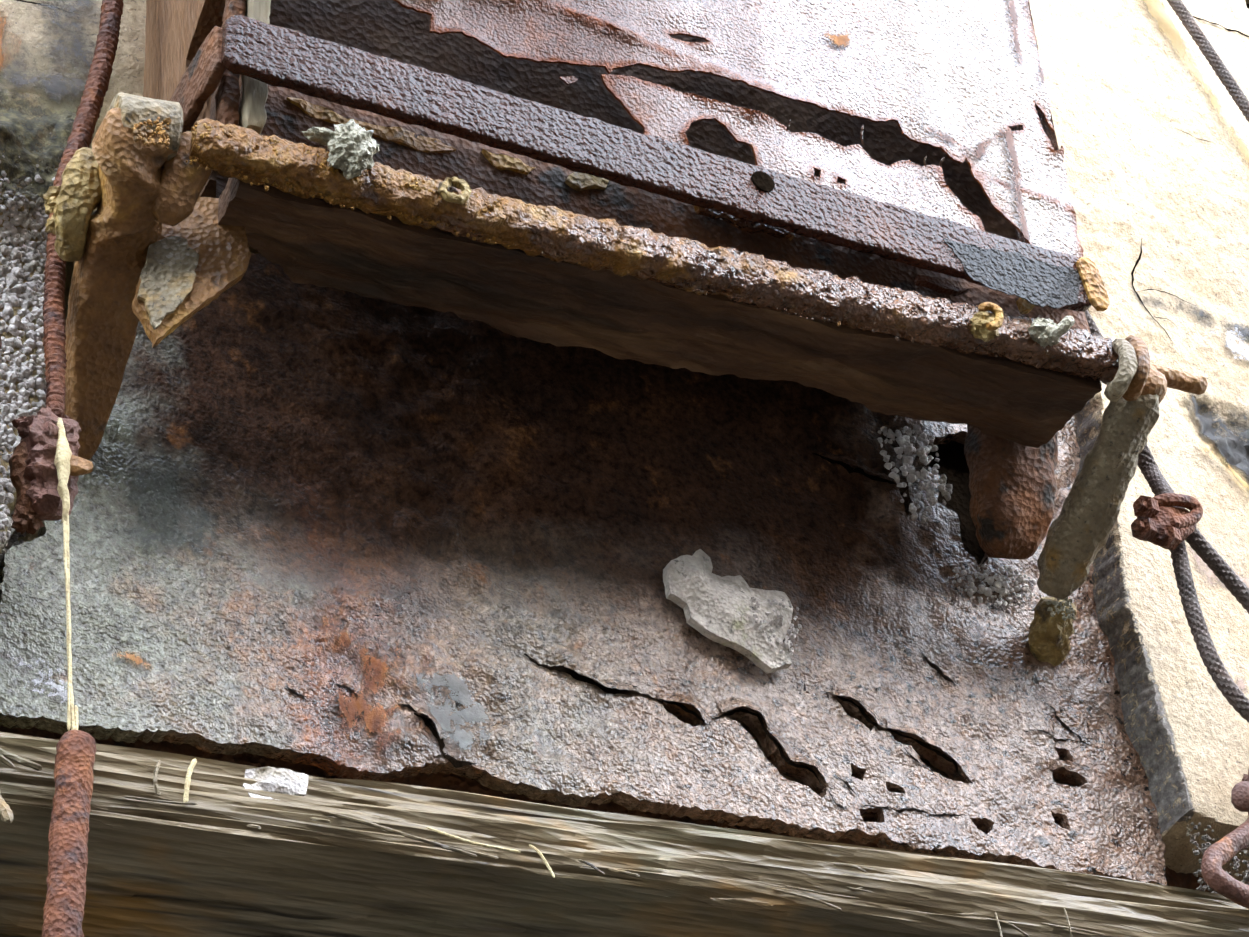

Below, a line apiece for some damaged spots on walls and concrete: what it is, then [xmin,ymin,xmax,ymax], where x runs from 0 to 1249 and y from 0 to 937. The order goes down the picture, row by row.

crack [16,0,83,16]
corrosion [559,76,579,85]
spalling [1190,393,1249,481]
corrosion [321,609,406,755]
crack [524,652,977,818]